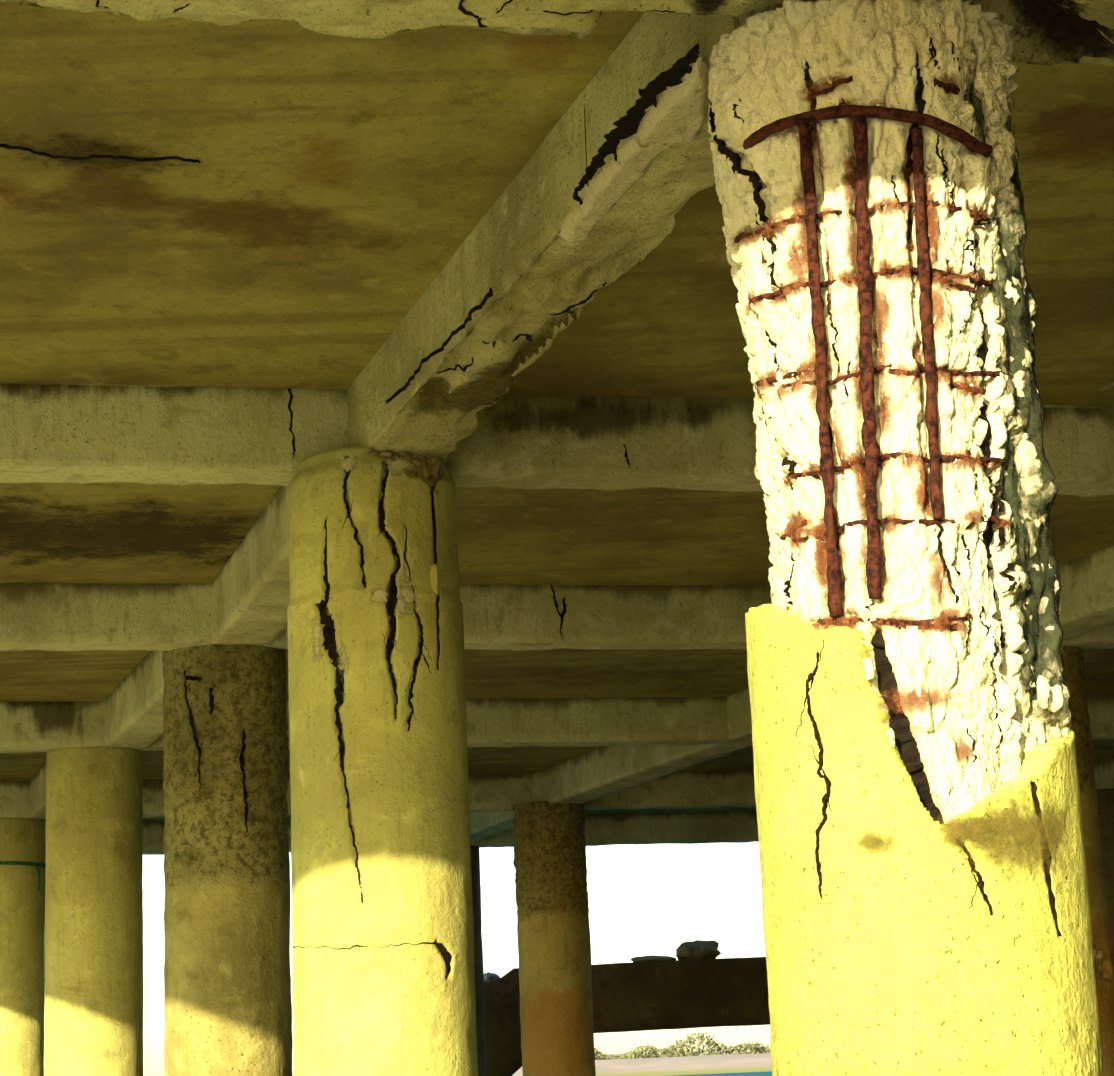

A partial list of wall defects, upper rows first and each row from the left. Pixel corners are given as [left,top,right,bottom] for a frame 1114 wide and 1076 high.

leakage [1011,0,1114,62]
crack [315,455,440,903]
spalling [416,306,584,413]
corrosion [735,154,858,311]
crack [796,639,833,899]
spalling [558,0,1072,823]
corrosion [780,511,857,629]
corrosion [750,336,931,517]
crack [865,600,993,916]
crack [891,38,1017,773]
leakage [988,107,1039,395]
leakage [996,416,1067,705]